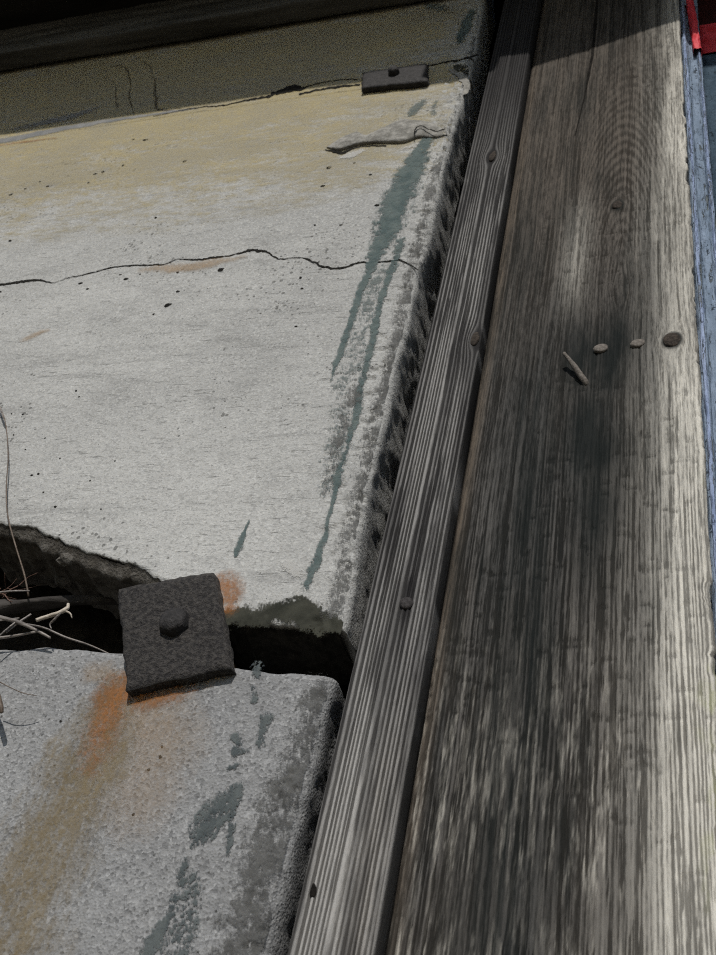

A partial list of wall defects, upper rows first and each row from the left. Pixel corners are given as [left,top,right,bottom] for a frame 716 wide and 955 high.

crack [428,54,479,66]
crack [103,61,360,116]
spalling [325,119,447,164]
crack [0,249,418,285]
water stain [0,0,480,619]
spalling [0,523,161,619]
water stain [208,674,328,955]